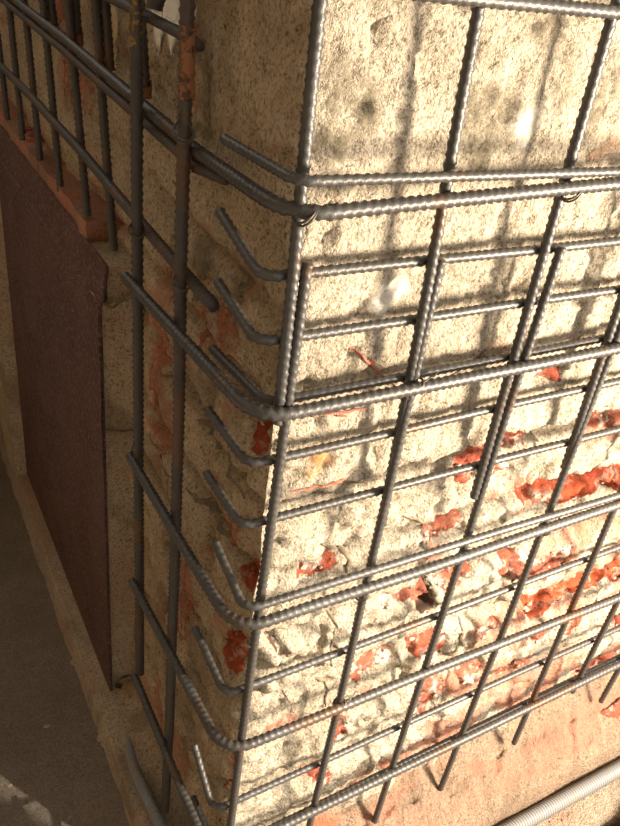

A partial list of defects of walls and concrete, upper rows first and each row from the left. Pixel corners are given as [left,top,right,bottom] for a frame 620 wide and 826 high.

spalling [120,207,620,826]